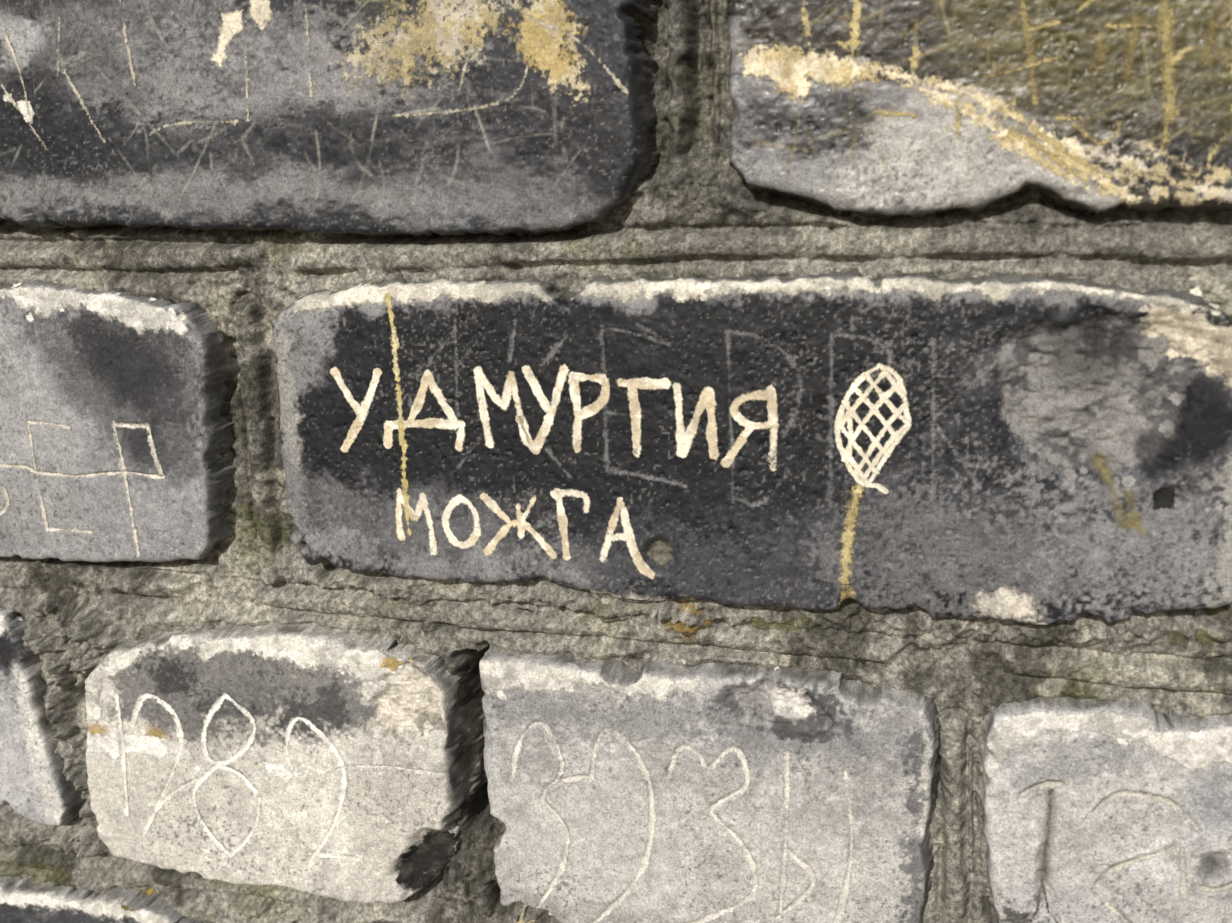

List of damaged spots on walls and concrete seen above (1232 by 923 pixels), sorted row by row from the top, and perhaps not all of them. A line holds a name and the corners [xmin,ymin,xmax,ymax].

peeling [334,0,590,106]
peeling [738,44,1232,207]